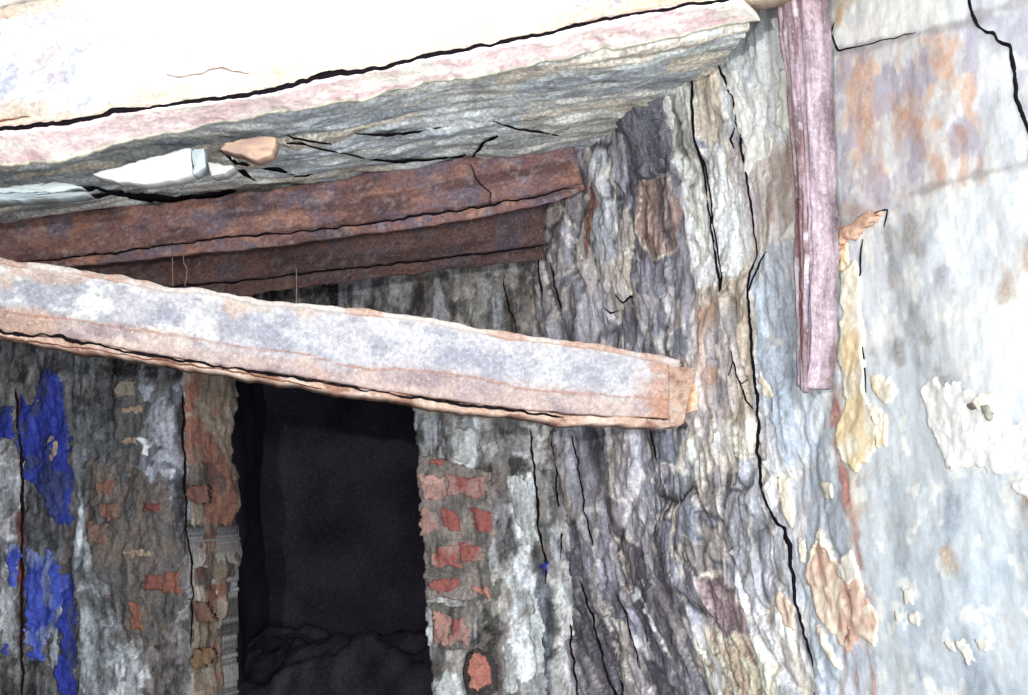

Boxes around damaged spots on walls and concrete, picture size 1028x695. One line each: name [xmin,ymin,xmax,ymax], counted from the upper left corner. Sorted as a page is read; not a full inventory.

crack [0,0,730,131]
crack [831,22,916,52]
crack [968,0,1028,133]
crack [26,121,581,262]
peeling [6,543,79,695]
crack [0,329,640,695]
crack [649,430,657,460]
crack [690,66,813,667]
flaking render [757,371,774,399]
flaking render [775,477,879,670]
flaking render [835,242,898,472]
flaking render [920,376,1028,502]